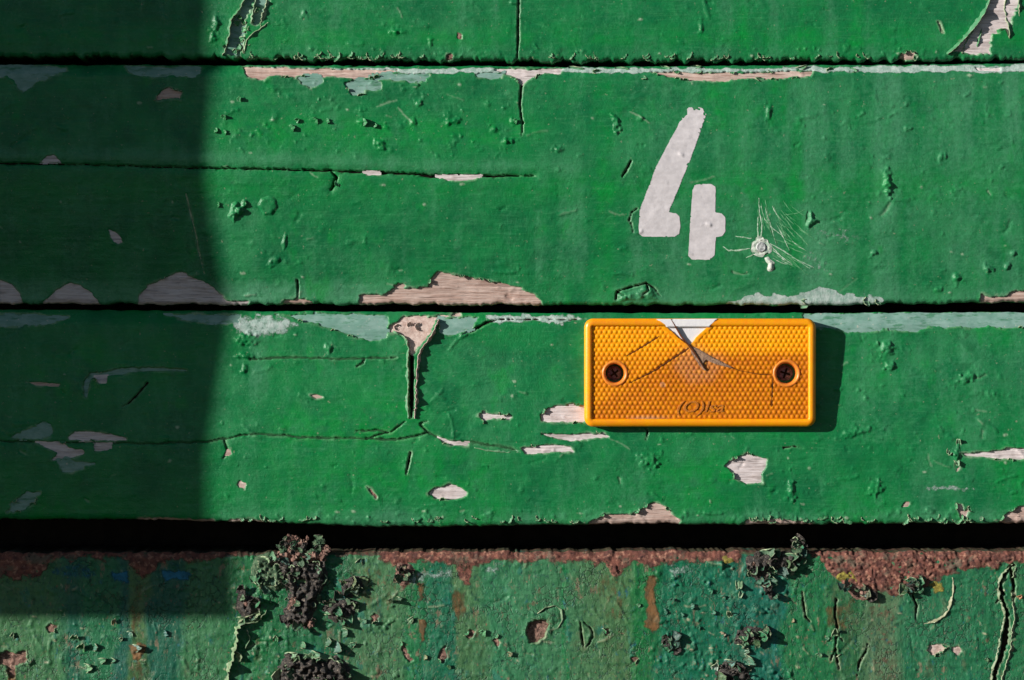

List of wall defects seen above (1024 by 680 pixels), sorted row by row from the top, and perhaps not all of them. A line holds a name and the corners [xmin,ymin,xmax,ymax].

peeling [222,0,1024,96]
crack [517,85,525,132]
peeling [726,287,1024,333]
peeling [138,272,581,419]
crack [58,354,515,470]
peeling [437,402,609,454]
peeling [430,484,467,501]
peeling [570,503,681,524]
peeling [725,452,767,484]
rust [0,551,237,594]
rust [236,534,369,631]
rust [365,533,1024,655]